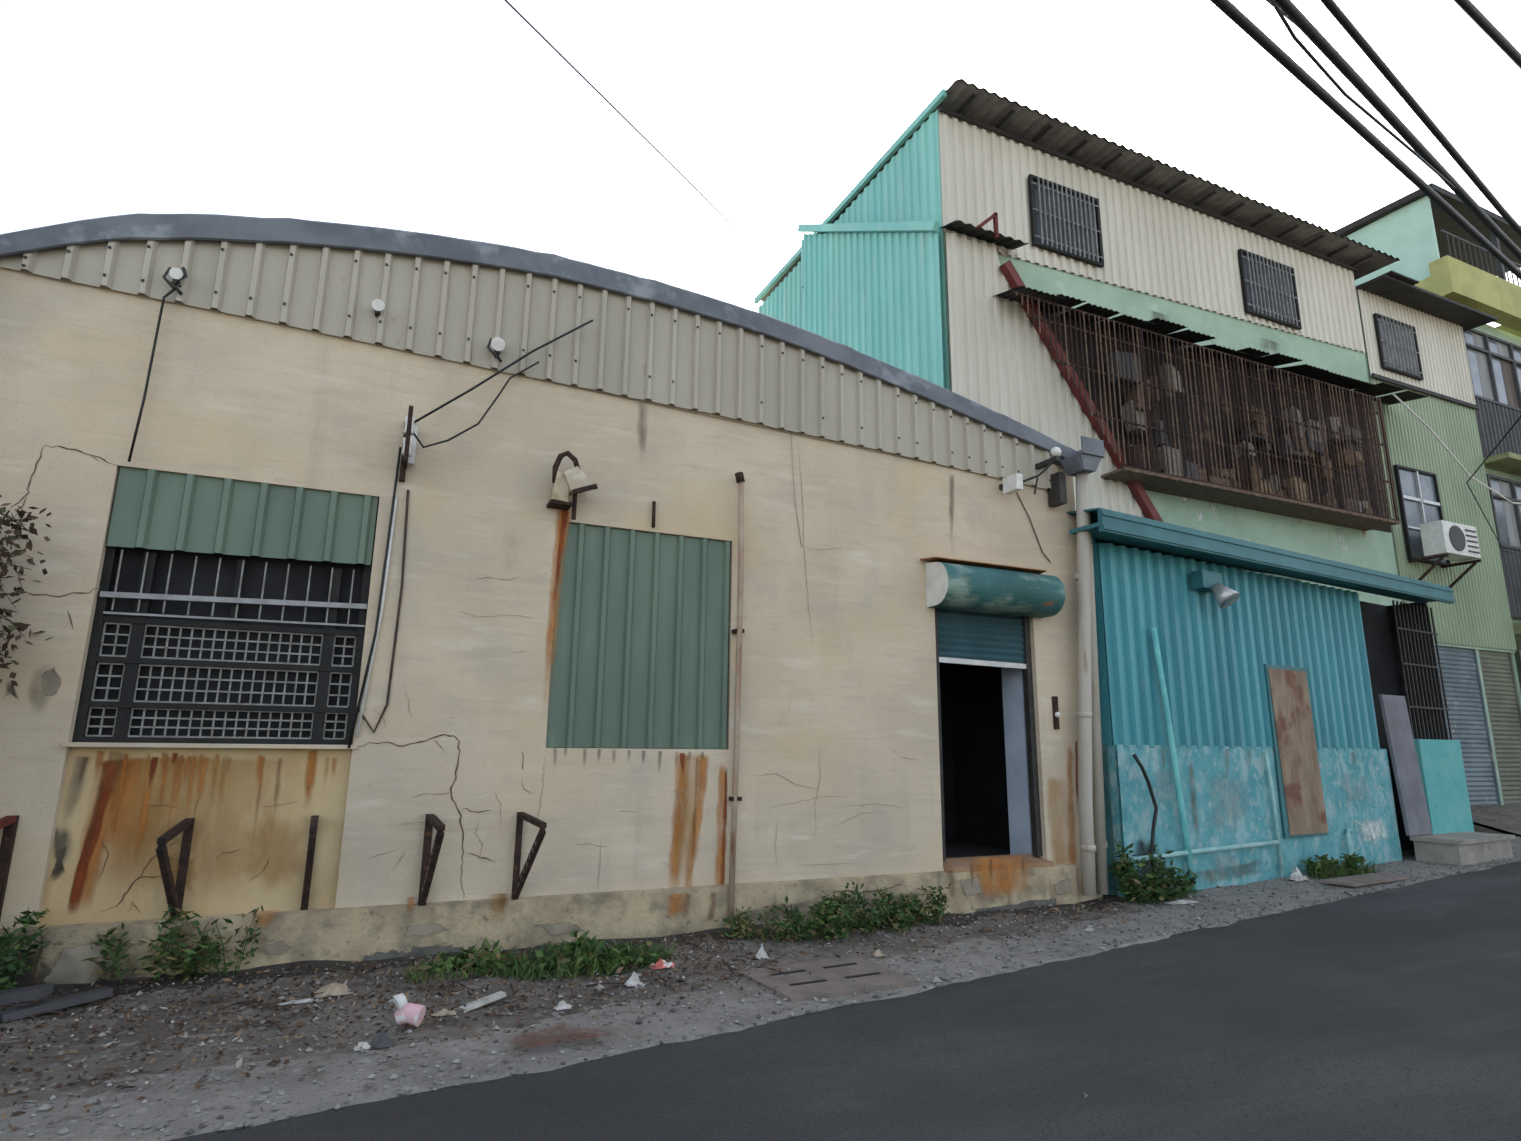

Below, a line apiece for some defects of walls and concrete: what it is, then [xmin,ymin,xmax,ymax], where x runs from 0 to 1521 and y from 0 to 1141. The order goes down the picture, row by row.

crack [10,444,115,516]
rust [69,751,225,909]
rust [306,752,316,789]
crack [357,692,546,898]
rust [671,753,727,912]
rust [972,857,1016,891]